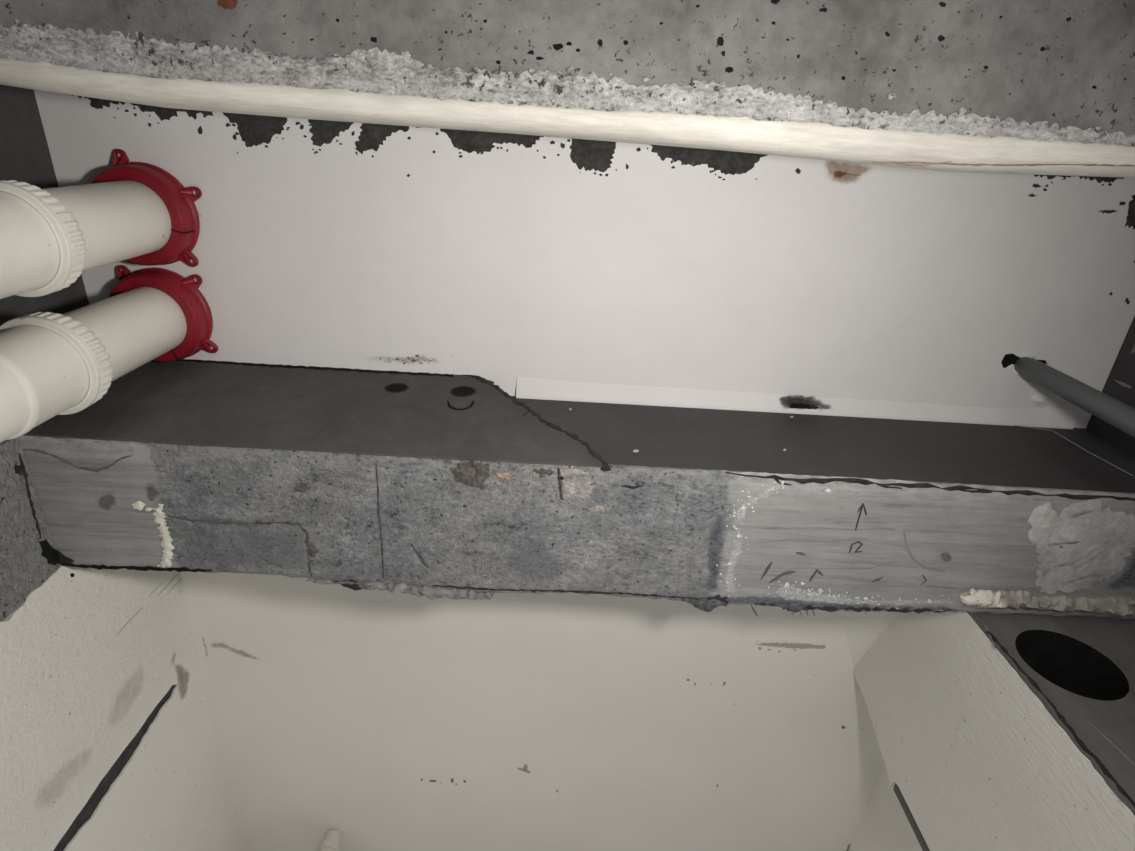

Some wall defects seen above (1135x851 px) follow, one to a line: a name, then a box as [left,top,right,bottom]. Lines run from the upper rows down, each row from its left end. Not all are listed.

peeling [66,94,420,157]
peeling [435,129,629,176]
peeling [636,145,767,180]
corrosion [828,162,867,181]
peeling [1027,175,1124,197]
peeling [1099,195,1135,229]
flaking render [781,396,829,418]
spalling [450,460,511,489]
crack [18,449,133,539]
crack [168,516,312,577]